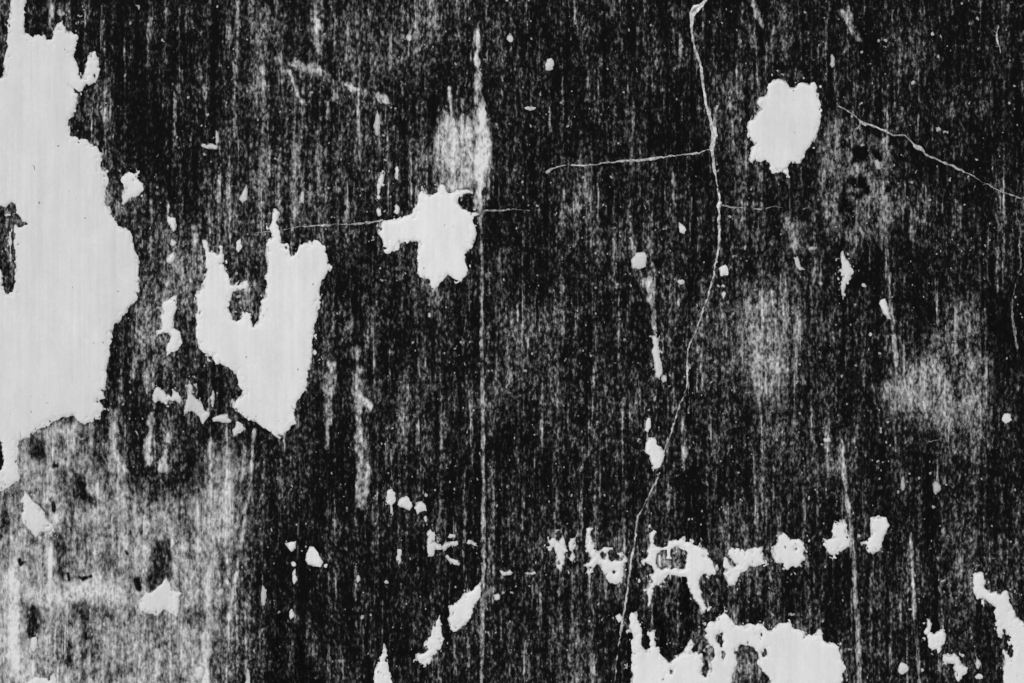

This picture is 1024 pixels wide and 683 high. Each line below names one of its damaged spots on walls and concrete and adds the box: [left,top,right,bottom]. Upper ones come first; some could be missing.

peeling [747,70,822,181]
peeling [0,0,144,538]
peeling [152,202,332,439]
peeling [376,166,480,293]
crack [546,0,805,677]
crack [838,105,1022,349]
peeling [138,577,186,617]
peeling [413,582,500,667]
peeling [544,527,628,584]
peeling [615,524,848,683]
peeling [823,515,890,560]
peeling [970,565,1024,683]